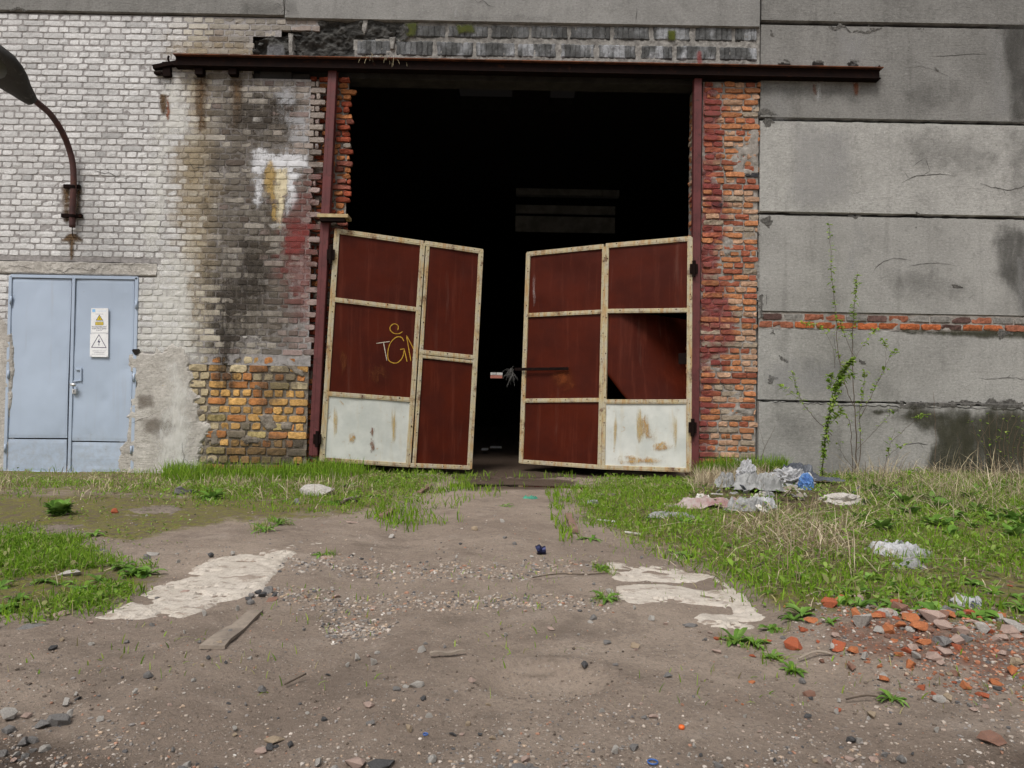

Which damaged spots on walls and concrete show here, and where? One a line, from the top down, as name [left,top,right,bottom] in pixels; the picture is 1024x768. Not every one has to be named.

spalling [252,20,409,57]
corrosion [160,94,170,121]
water stain [230,80,242,128]
water stain [252,148,308,222]
corrosion [62,188,82,259]
water stain [239,242,271,297]
water stain [214,291,234,389]
flaking render [118,343,220,473]
corrosion [628,414,667,463]
water stain [873,408,1024,475]